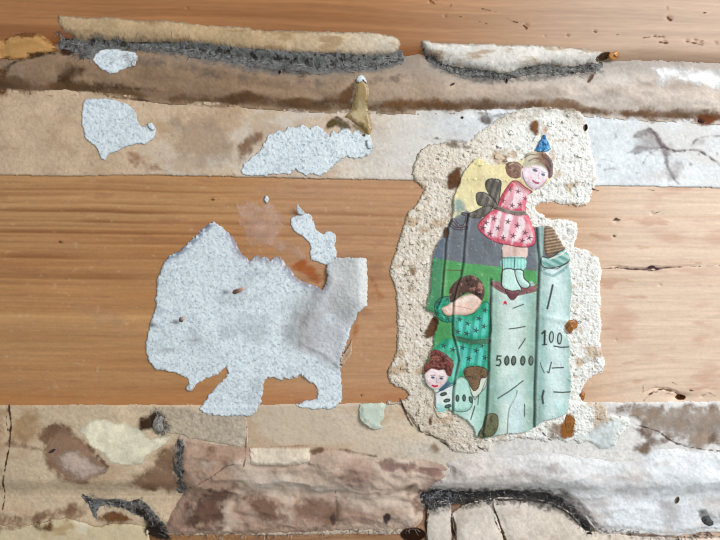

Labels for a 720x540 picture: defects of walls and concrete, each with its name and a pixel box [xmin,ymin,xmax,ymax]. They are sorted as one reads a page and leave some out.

damp [283,84,355,105]
damp [380,99,453,111]
damp [532,99,599,112]
peeling [145,204,368,417]
rust [551,414,576,439]
crack [2,405,12,510]
damp [7,416,106,484]